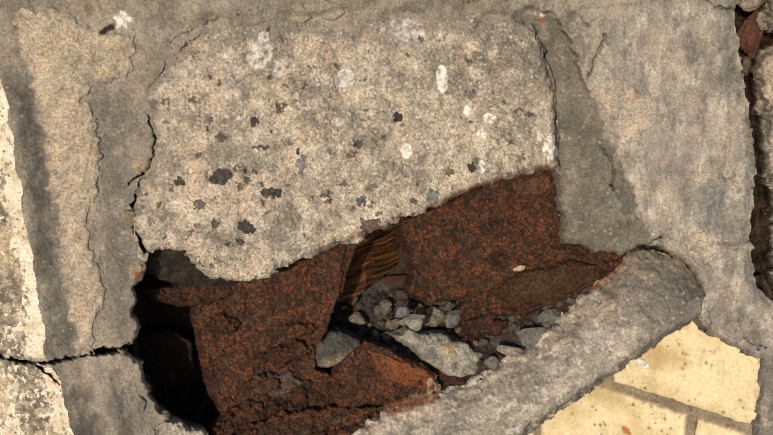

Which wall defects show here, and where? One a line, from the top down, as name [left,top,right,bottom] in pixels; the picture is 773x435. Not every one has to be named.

crack [719,0,773,300]
peeling [205,310,241,336]
crack [0,355,74,376]
crack [94,344,130,355]
peeling [241,321,318,397]
rust [367,349,439,415]
spalling [149,415,209,435]
peeling [248,404,384,435]